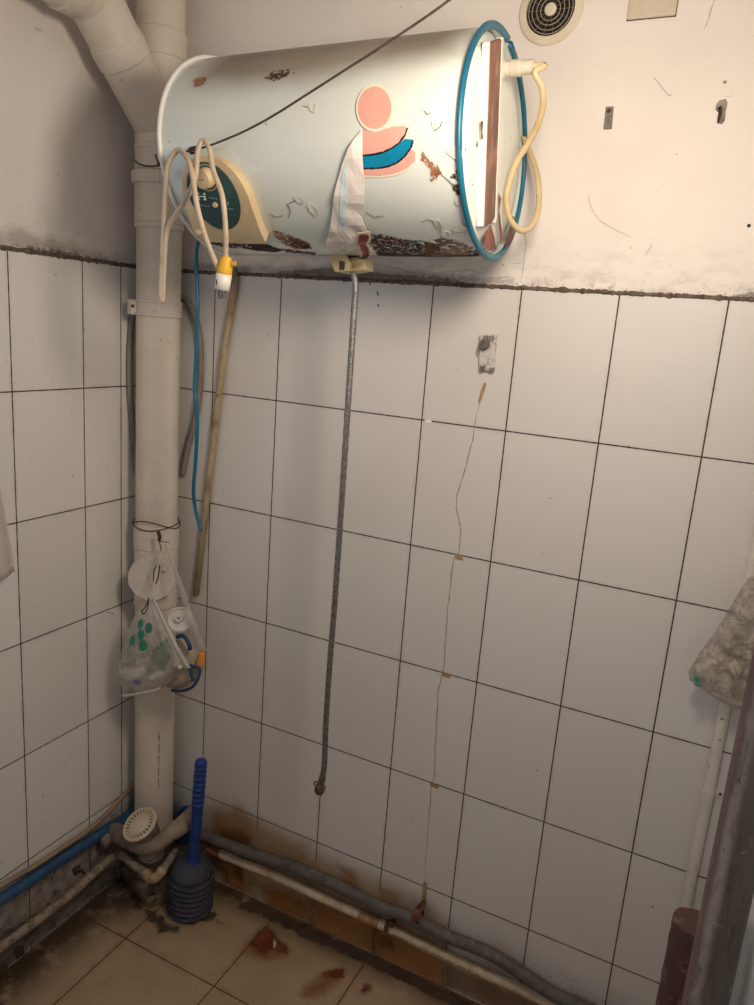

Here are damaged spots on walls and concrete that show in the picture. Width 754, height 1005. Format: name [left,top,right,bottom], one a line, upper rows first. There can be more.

crack [422,382,486,901]
rust [247,926,287,958]
rust [305,970,343,994]
rust [314,902,442,985]